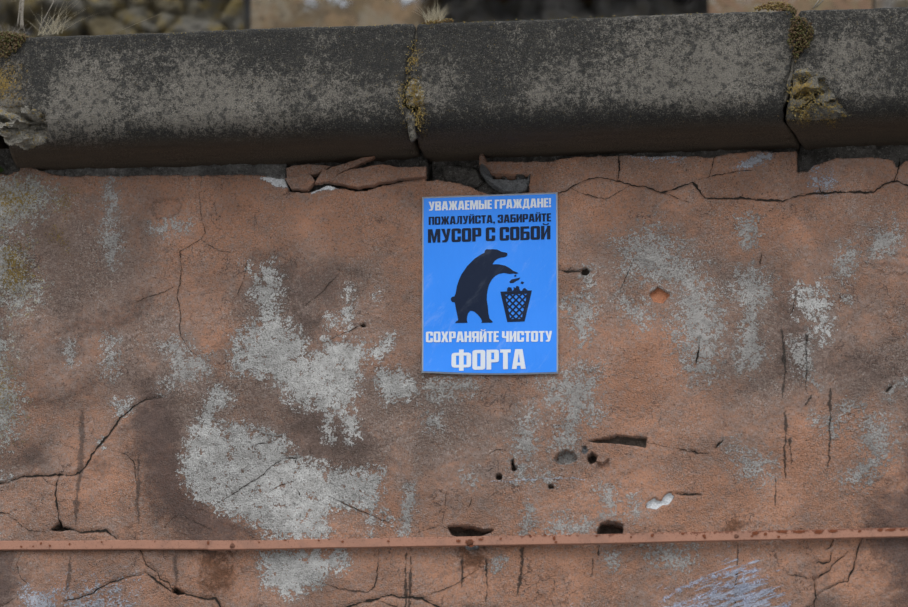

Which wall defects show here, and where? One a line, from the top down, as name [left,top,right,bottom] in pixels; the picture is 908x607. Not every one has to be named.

spalling [786,68,851,121]
crack [558,157,908,202]
spalling [0,105,908,457]
peeling [455,206,908,536]
crack [0,397,162,538]
leakage [135,392,252,541]
peeling [151,255,486,603]
leakage [774,411,793,506]
crack [68,550,221,607]
crack [311,551,477,607]
corrosion [722,519,838,538]
crack [791,540,862,607]